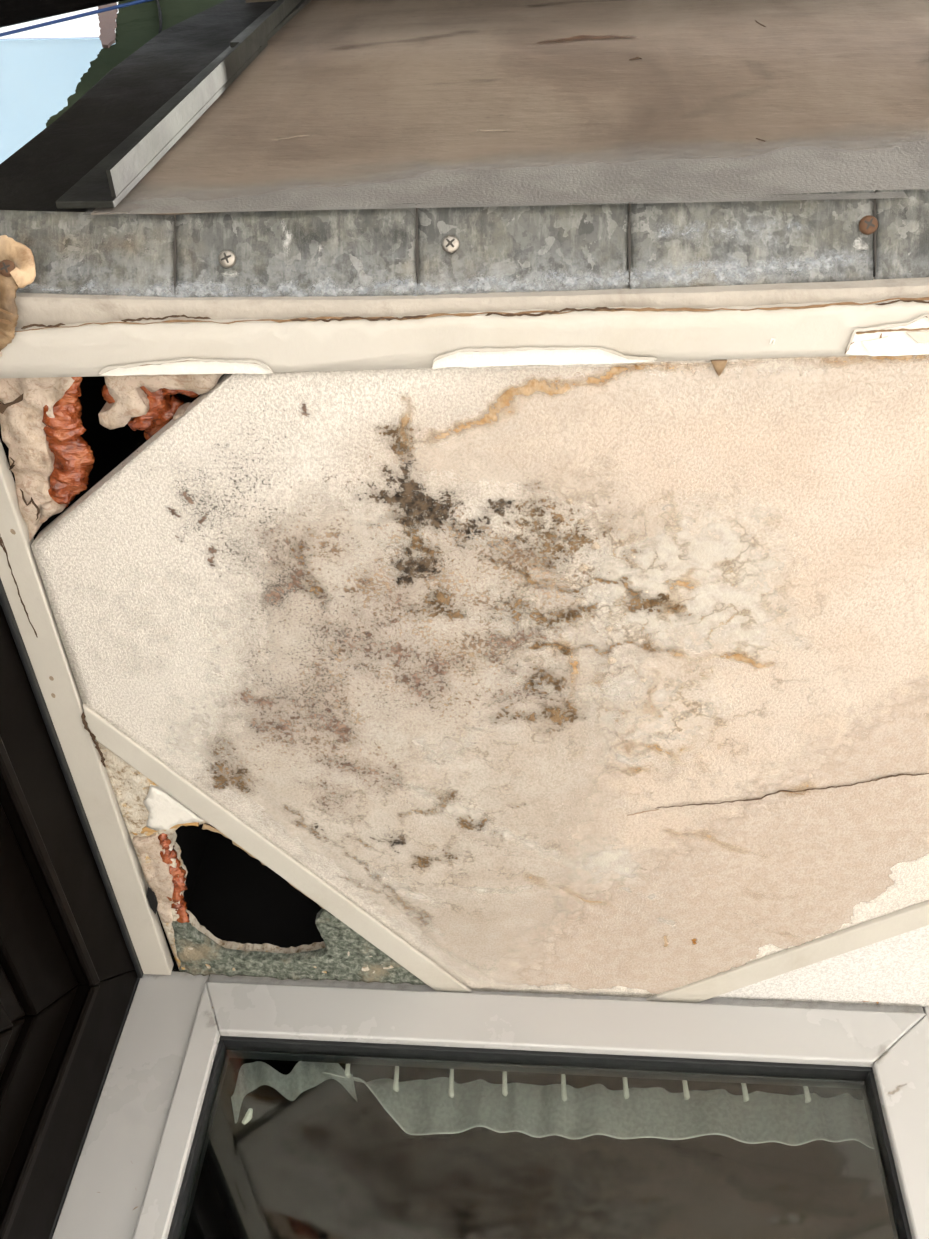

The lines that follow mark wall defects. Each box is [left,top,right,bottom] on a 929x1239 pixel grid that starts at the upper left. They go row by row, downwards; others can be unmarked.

peeling [432,346,657,369]
peeling [845,314,929,356]
spalling [98,358,273,440]
spalling [0,377,95,541]
leakage [197,355,929,994]
flaking render [144,784,204,831]
crack [627,773,929,816]
corrosion [132,822,266,866]